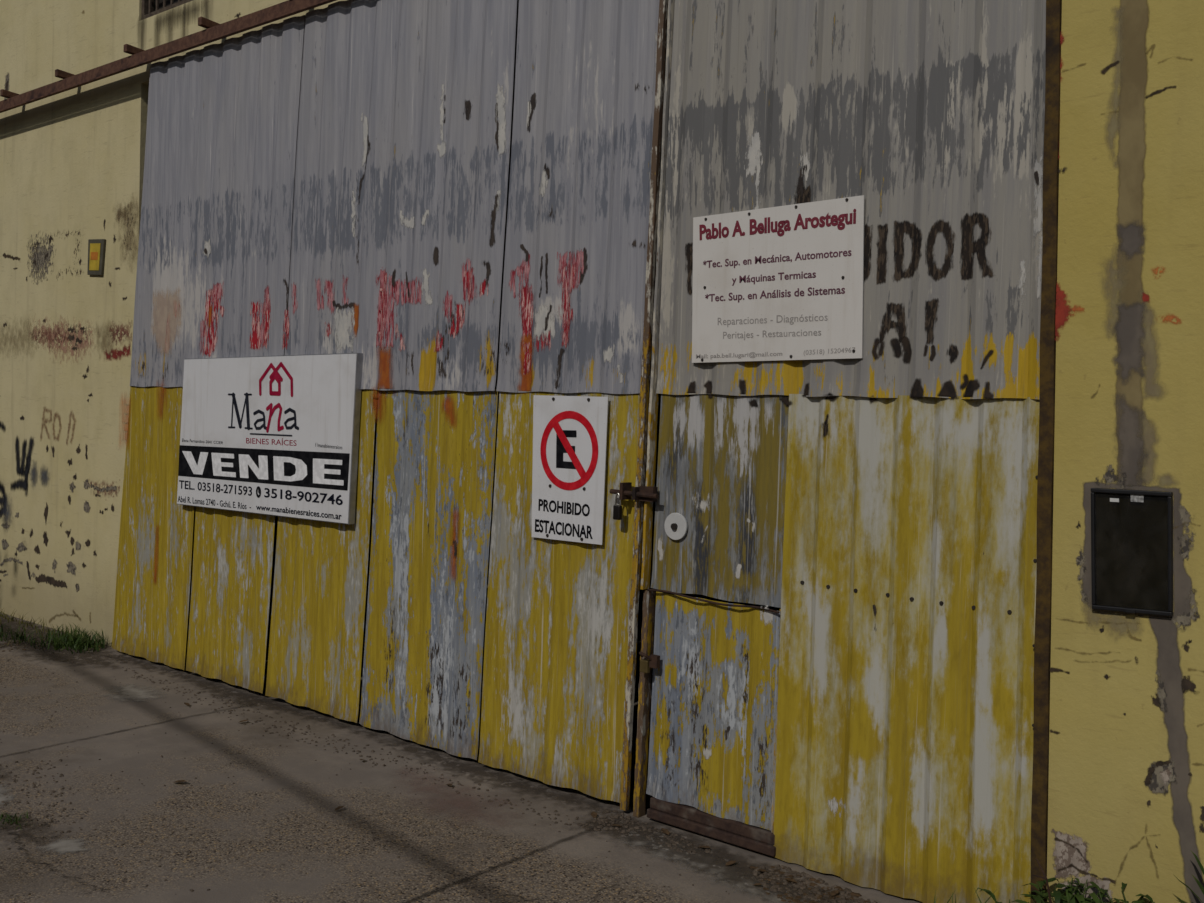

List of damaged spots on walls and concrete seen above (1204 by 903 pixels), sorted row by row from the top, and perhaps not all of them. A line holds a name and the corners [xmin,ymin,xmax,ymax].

peeling [744,131,763,209]
peeling [797,153,810,196]
peeling [489,190,501,246]
peeling [316,277,356,351]
peeling [376,246,491,377]
peeling [482,244,584,389]
peeling [760,605,776,624]
peeling [425,641,470,741]
peeling [686,653,712,790]
peeling [757,739,768,806]
peeling [1144,760,1192,806]
peeling [1051,829,1116,903]